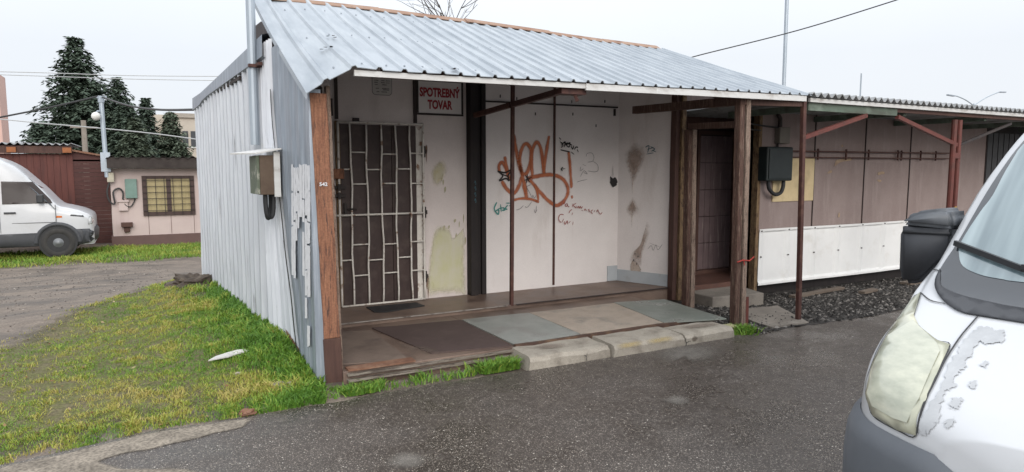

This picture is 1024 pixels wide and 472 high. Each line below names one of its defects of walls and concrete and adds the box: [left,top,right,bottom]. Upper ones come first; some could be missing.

damp [628,150,642,189]
peeling [429,215,466,294]